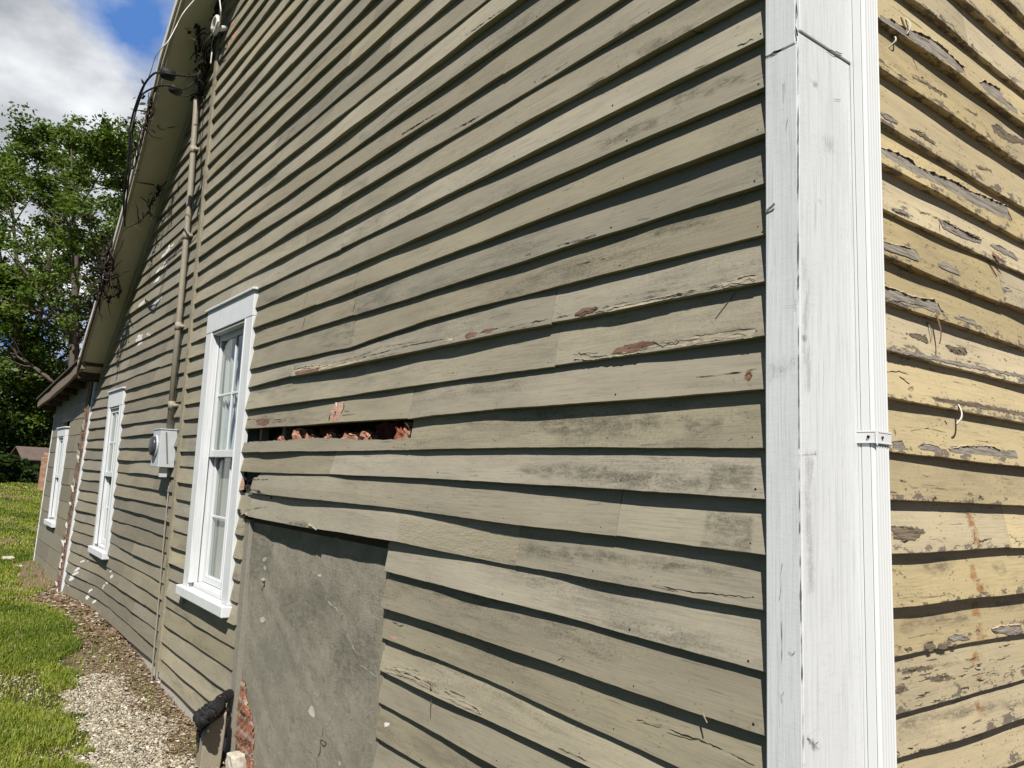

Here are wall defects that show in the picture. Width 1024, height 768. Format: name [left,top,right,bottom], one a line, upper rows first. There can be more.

peeling [880,15,1018,114]
peeling [881,147,1013,221]
peeling [883,200,1018,292]
peeling [575,294,673,316]
peeling [885,286,977,325]
peeling [612,327,756,355]
peeling [887,333,1024,378]
spalling [247,401,414,447]
peeling [892,440,1018,459]
spalling [235,680,254,768]